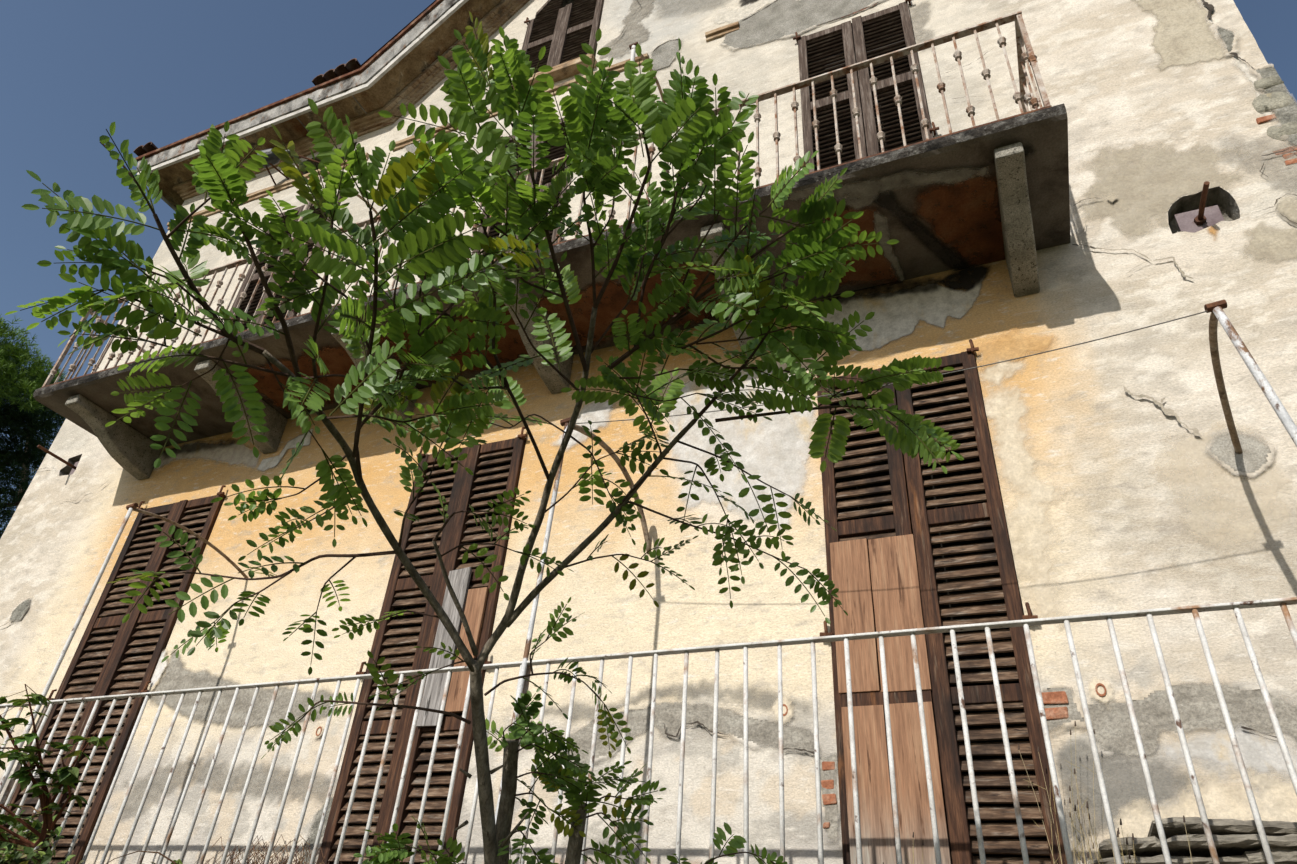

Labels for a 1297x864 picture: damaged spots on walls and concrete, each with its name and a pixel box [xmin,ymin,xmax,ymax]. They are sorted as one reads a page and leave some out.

spalling [651,39,681,70]
spalling [720,0,883,50]
crack [1200,0,1214,23]
crack [1228,52,1255,70]
spalling [1250,64,1297,166]
water stain [1083,145,1239,236]
crack [1257,148,1297,224]
peeling [816,278,984,351]
peeling [669,369,814,528]